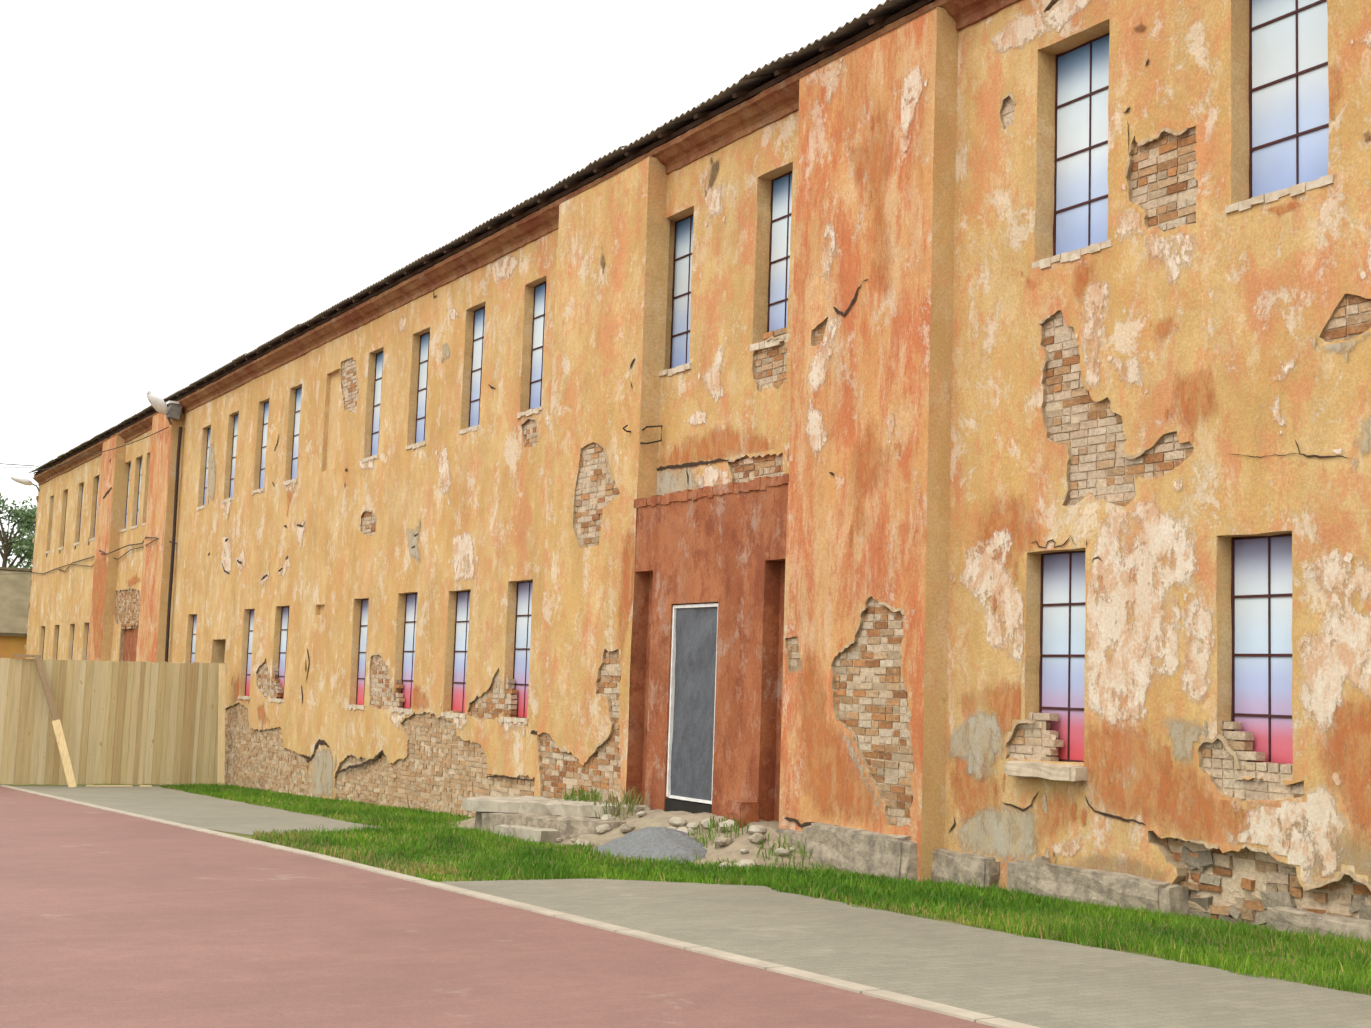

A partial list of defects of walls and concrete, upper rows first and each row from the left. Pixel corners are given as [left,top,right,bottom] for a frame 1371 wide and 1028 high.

flaking render [1115,127,1199,283]
flaking render [755,327,788,391]
peeling [805,318,837,462]
flaking render [1323,294,1371,342]
flaking render [575,443,620,548]
flaking render [697,453,784,487]
peeling [1038,279,1215,725]
flaking render [334,650,628,817]
flaking render [834,597,914,827]
flaking render [1006,712,1064,761]
peeling [1297,549,1371,732]
flaking render [1156,721,1371,926]